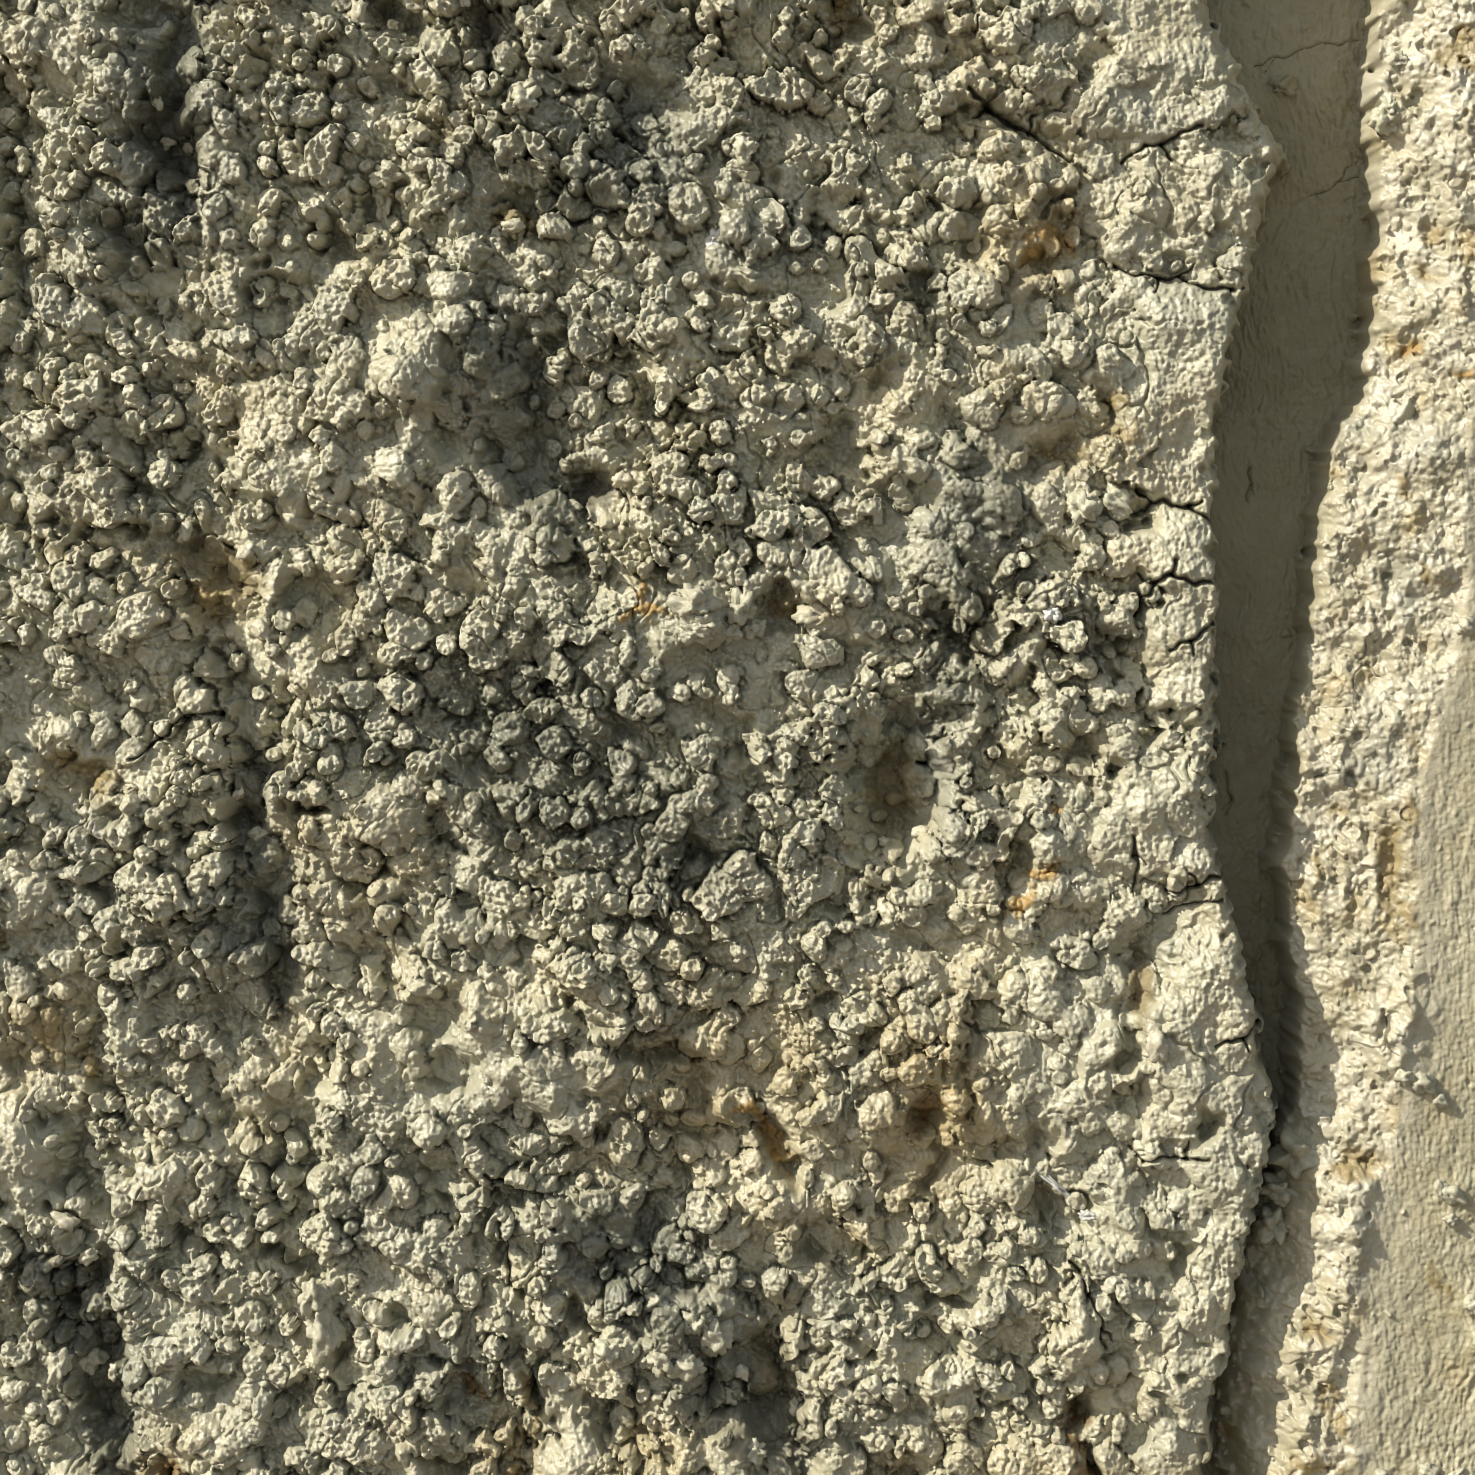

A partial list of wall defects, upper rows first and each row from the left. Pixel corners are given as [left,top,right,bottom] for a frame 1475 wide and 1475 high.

crack [968,86,1069,163]
crack [1121,124,1203,163]
crack [1113,264,1235,293]
crack [1135,486,1211,524]
crack [1133,563,1213,616]
crack [1172,623,1213,655]
spalling [1210,0,1475,1475]
crack [1132,835,1222,914]
crack [1217,1020,1256,1051]
rust [735,1101,797,1177]
crack [1131,1141,1209,1162]
crack [1069,1260,1112,1346]